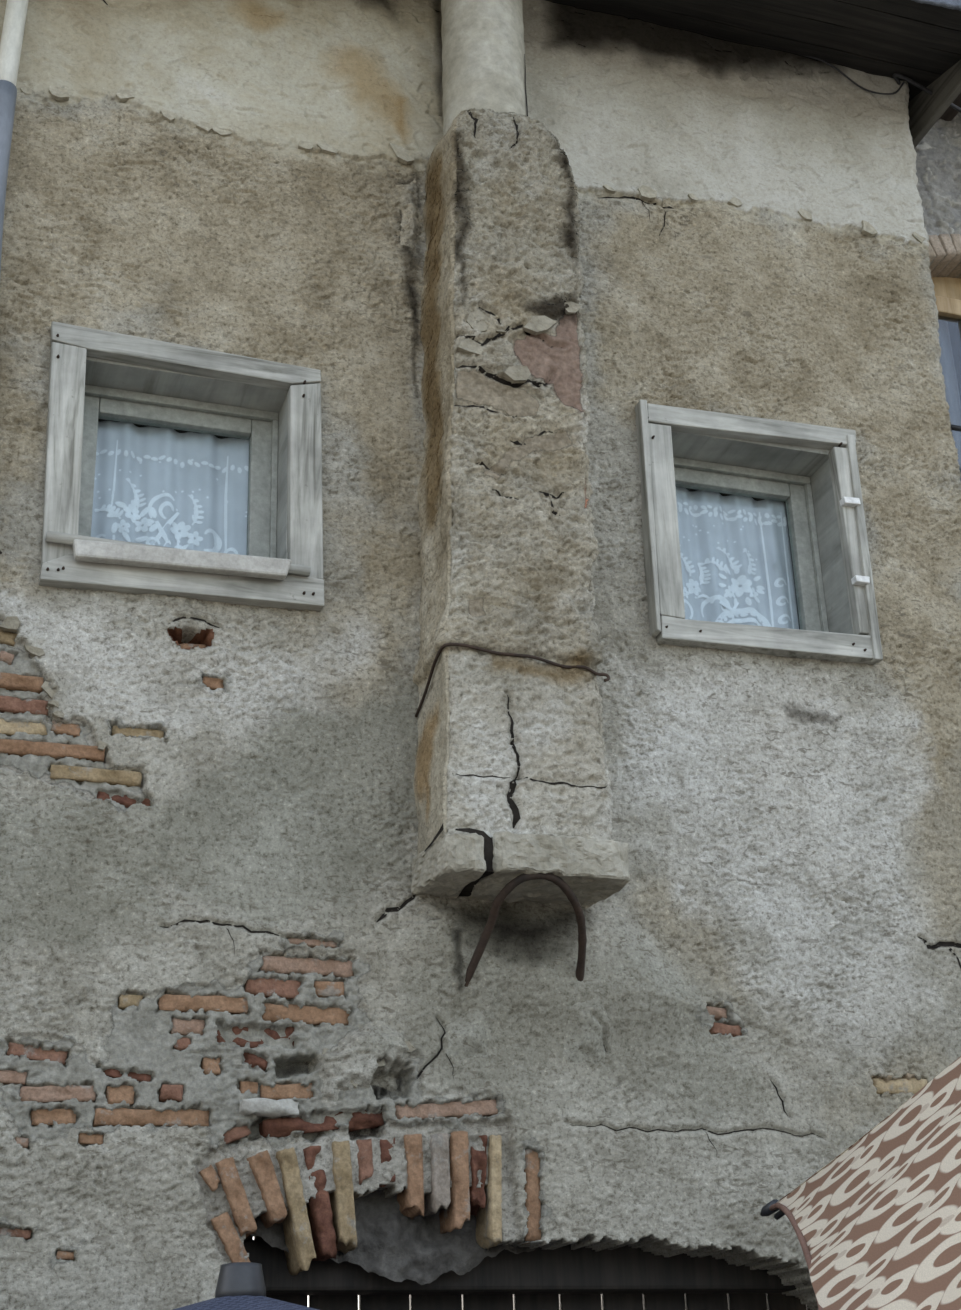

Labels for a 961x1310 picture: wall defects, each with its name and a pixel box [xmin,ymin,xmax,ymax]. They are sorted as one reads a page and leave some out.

spalling [456,301,584,417]
spalling [168,626,214,649]
spalling [0,616,166,811]
spalling [201,672,231,690]
crack [425,695,607,897]
crack [160,919,280,954]
crack [376,895,416,922]
crack [918,937,961,968]
spalling [0,931,505,1150]
crack [416,1018,454,1079]
crack [570,1081,823,1151]
spalling [517,1138,552,1245]